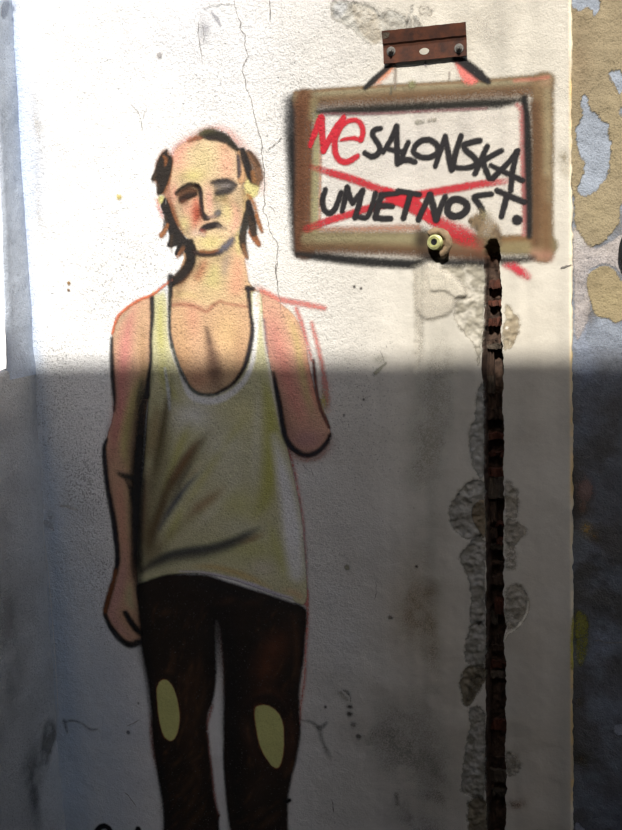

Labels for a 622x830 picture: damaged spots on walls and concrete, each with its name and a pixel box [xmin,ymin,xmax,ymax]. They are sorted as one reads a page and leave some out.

flaking render [331,0,432,45]
crack [200,1,285,318]
peeling [571,0,622,247]
flaking render [441,263,486,364]
flaking render [502,305,520,349]
peeling [586,266,622,349]
flaking render [504,481,526,570]
flaking render [449,384,489,830]
flaking render [504,584,530,640]